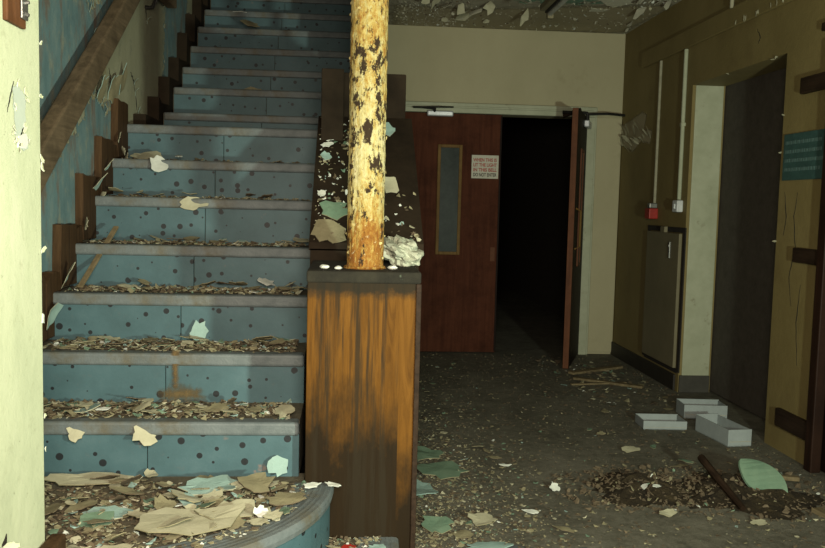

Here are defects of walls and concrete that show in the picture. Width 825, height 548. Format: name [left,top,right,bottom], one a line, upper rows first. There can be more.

peeling [421,0,495,23]
peeling [38,0,113,121]
peeling [7,79,30,153]
peeling [320,142,334,160]
peeling [384,177,399,193]
peeling [293,190,356,254]